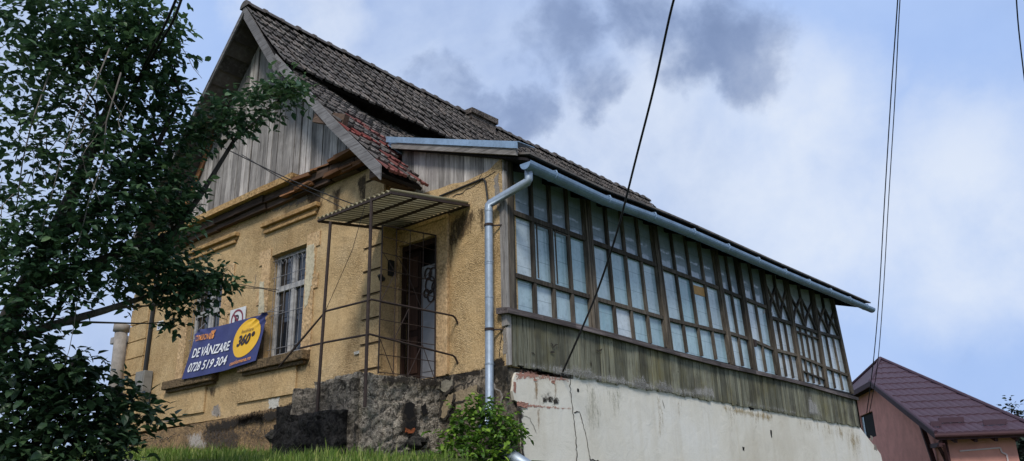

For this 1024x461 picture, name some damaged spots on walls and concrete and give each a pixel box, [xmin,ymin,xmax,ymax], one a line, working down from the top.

leakage [449,210,483,246]
peeling [494,349,714,409]
leakage [189,403,292,448]
crack [569,379,599,461]